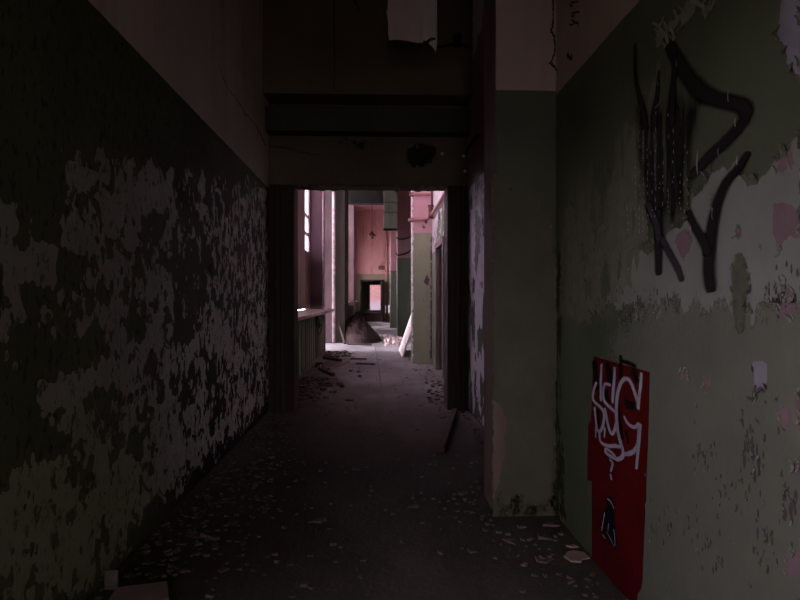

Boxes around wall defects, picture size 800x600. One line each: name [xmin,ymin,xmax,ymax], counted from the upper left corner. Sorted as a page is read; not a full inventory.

crack [549,0,557,73]
peeling [652,0,715,49]
peeling [770,0,800,82]
peeling [0,147,272,600]
peeling [465,172,557,517]
peeling [605,129,800,600]